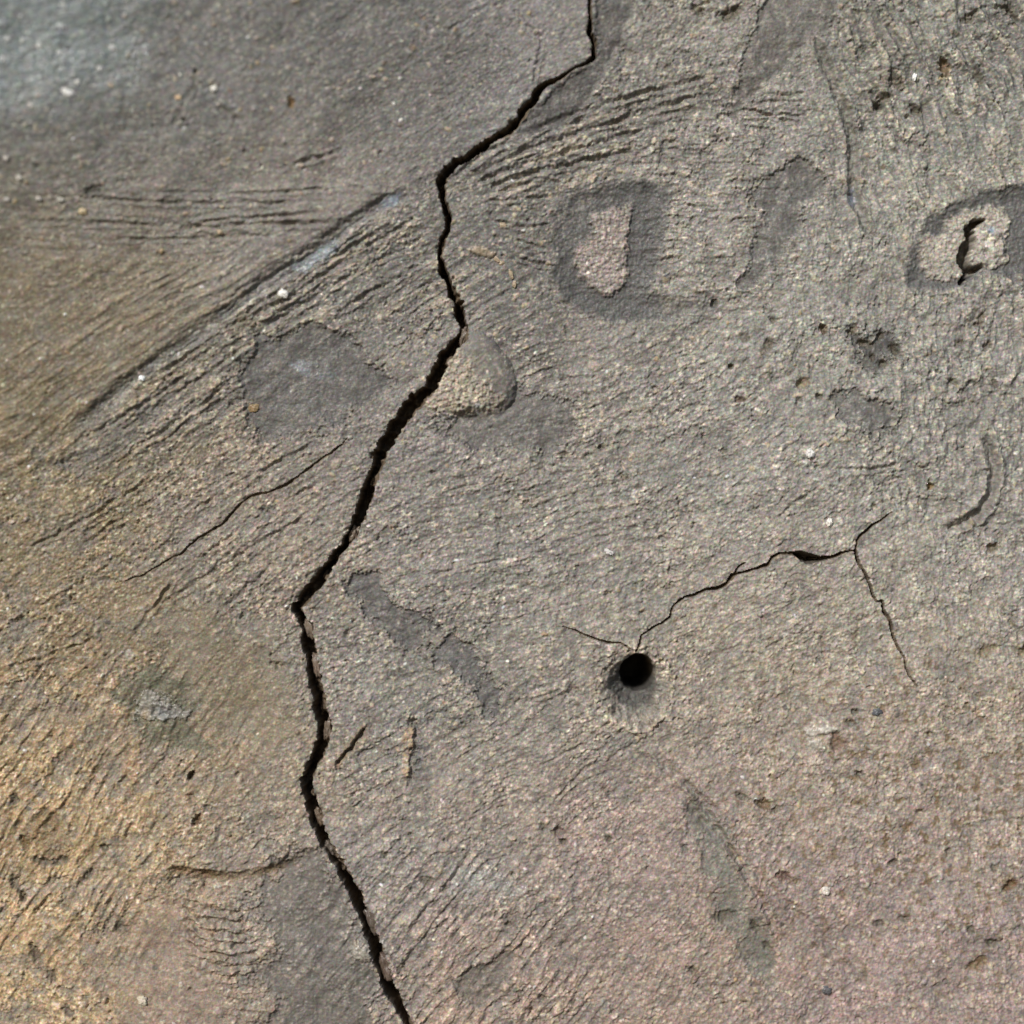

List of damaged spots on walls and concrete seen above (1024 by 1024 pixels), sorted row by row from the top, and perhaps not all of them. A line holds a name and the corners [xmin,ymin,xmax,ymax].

crack [116,437,348,584]
crack [291,0,598,1024]
crack [562,511,918,687]